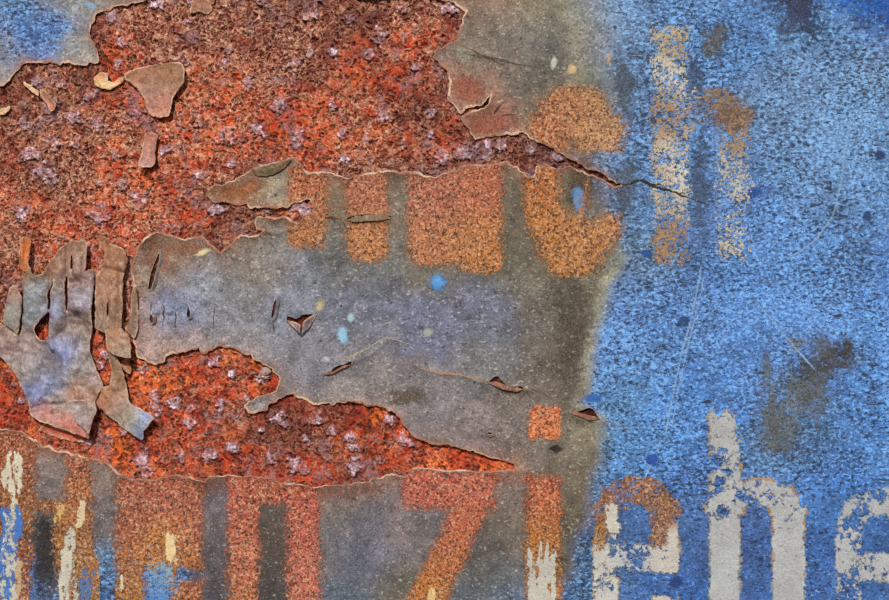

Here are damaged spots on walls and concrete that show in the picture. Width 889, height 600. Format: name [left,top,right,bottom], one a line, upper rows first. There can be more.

peeling [190,0,215,14]
crack [617,179,710,205]
corrosion [0,0,635,488]